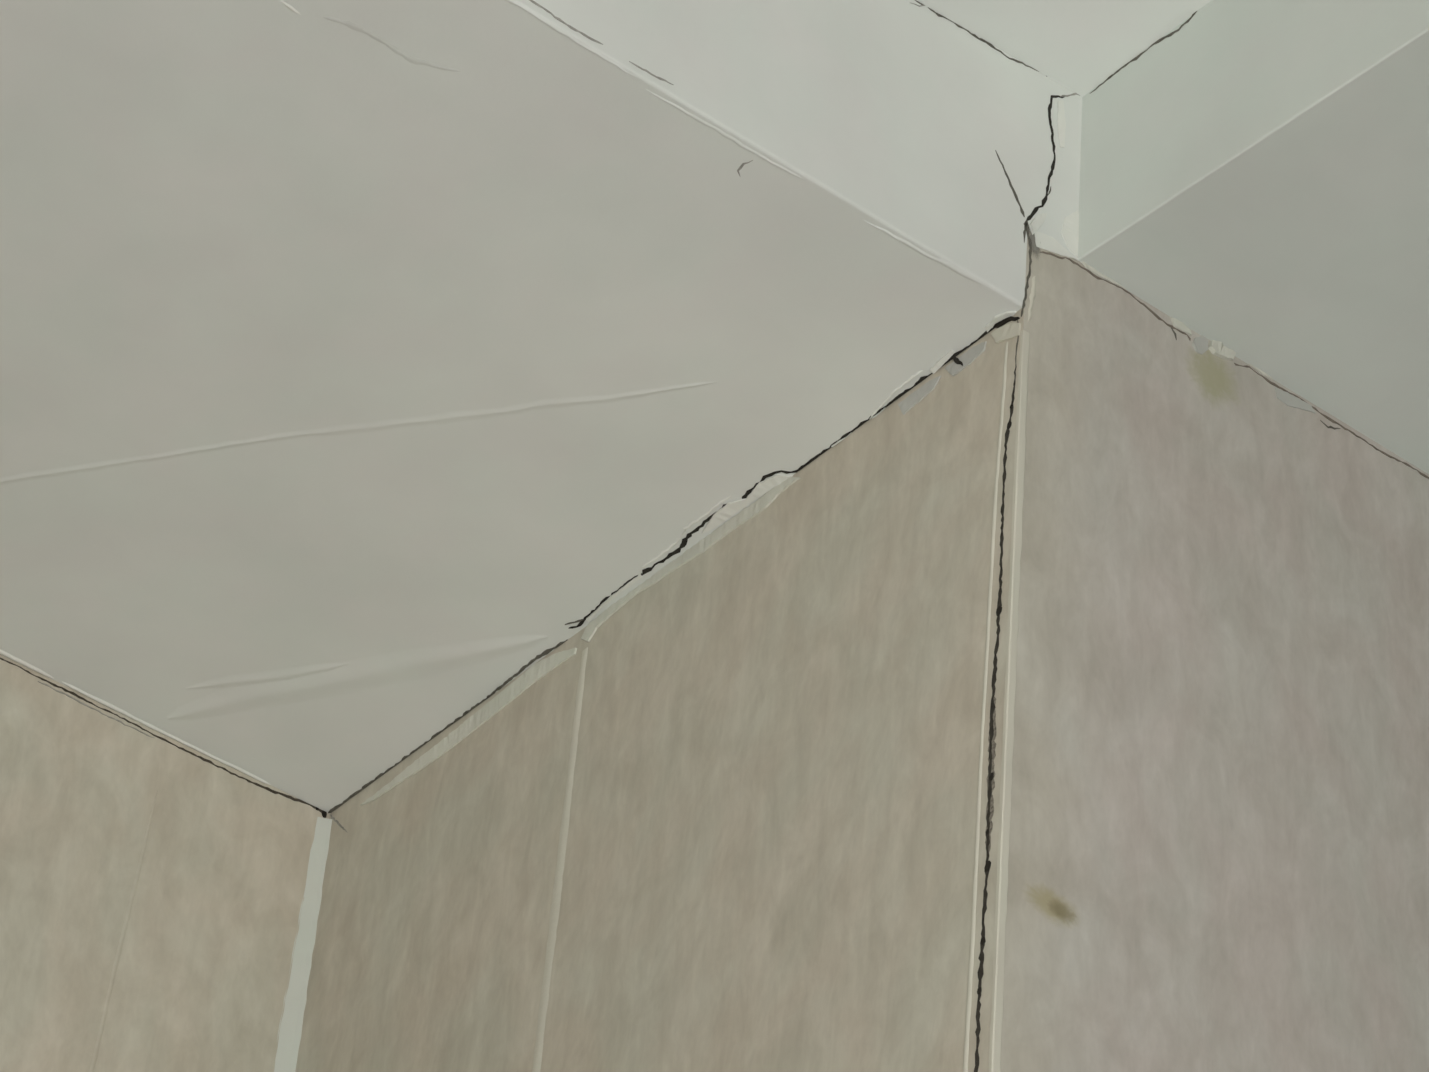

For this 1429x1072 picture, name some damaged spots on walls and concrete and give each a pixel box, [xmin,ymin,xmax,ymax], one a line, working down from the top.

crack [505,0,803,179]
crack [912,0,1039,72]
crack [1234,363,1429,479]
crack [0,321,1001,833]
crack [974,11,1197,1072]
damp [1015,878,1087,934]